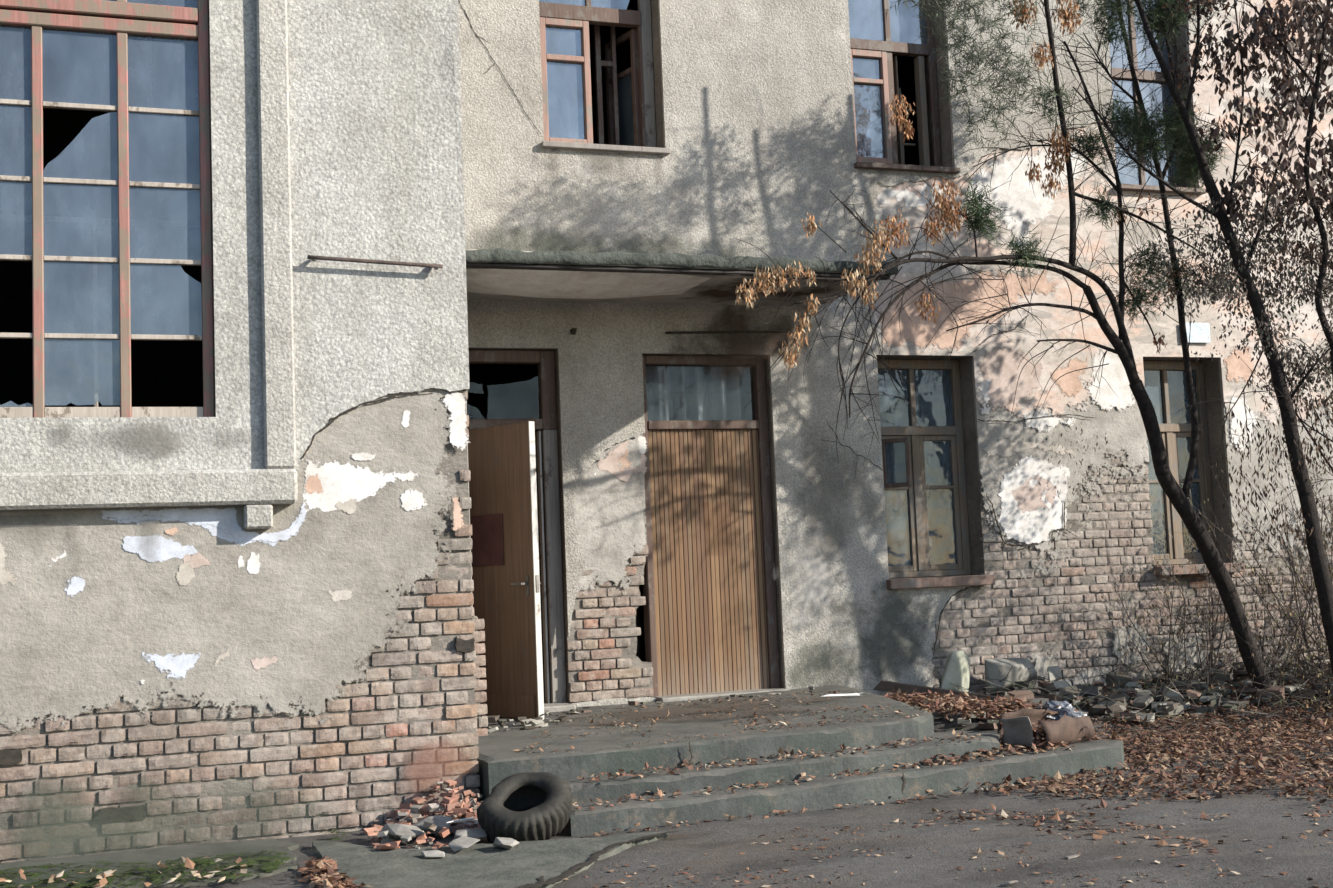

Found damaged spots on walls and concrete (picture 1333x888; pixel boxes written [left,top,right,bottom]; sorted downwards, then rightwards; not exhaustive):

crack [458,0,538,130]
flaking render [870,0,1333,695]
flaking render [0,388,488,863]
flaking render [565,434,654,702]
damp [793,464,849,625]
damp [847,590,929,679]